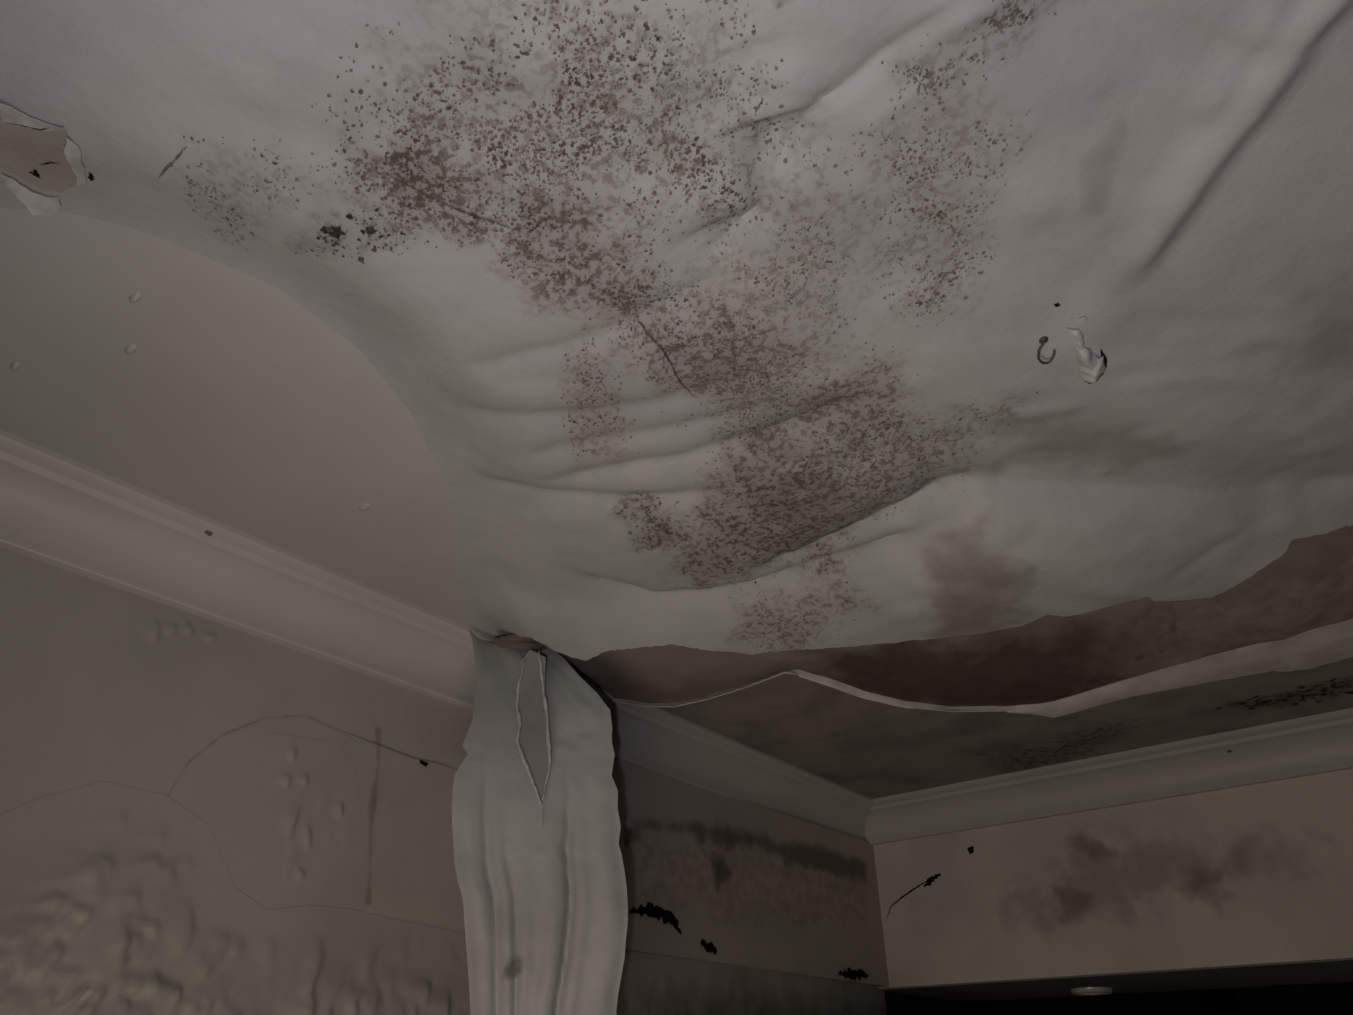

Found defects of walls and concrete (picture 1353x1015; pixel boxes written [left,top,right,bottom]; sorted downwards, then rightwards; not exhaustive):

peeling [0,103,94,216]
leakage [295,0,1057,652]
peeling [657,657,1353,799]